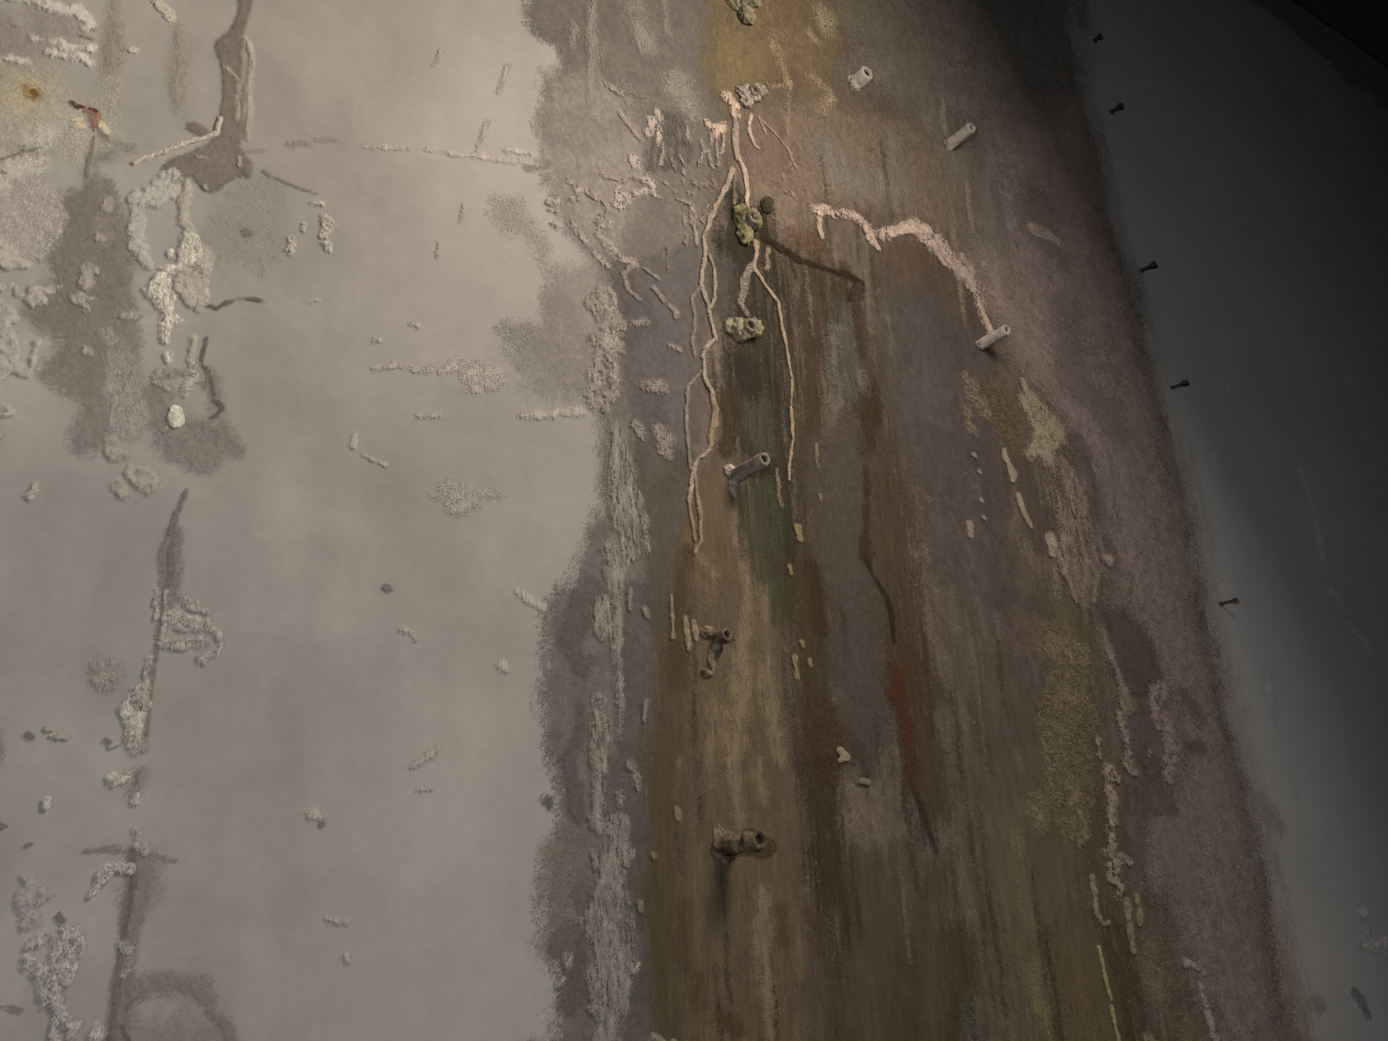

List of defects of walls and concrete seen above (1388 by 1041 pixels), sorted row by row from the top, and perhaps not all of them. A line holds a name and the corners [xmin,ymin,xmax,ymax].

peeling [0,0,98,84]
peeling [151,0,177,22]
peeling [0,122,101,439]
damp [19,0,342,500]
crack [191,296,265,460]
crack [761,222,868,359]
crack [859,464,896,643]
damp [483,0,1319,1041]
crack [102,489,188,804]
crack [908,780,940,855]
crack [55,911,66,925]
crack [80,839,178,1041]